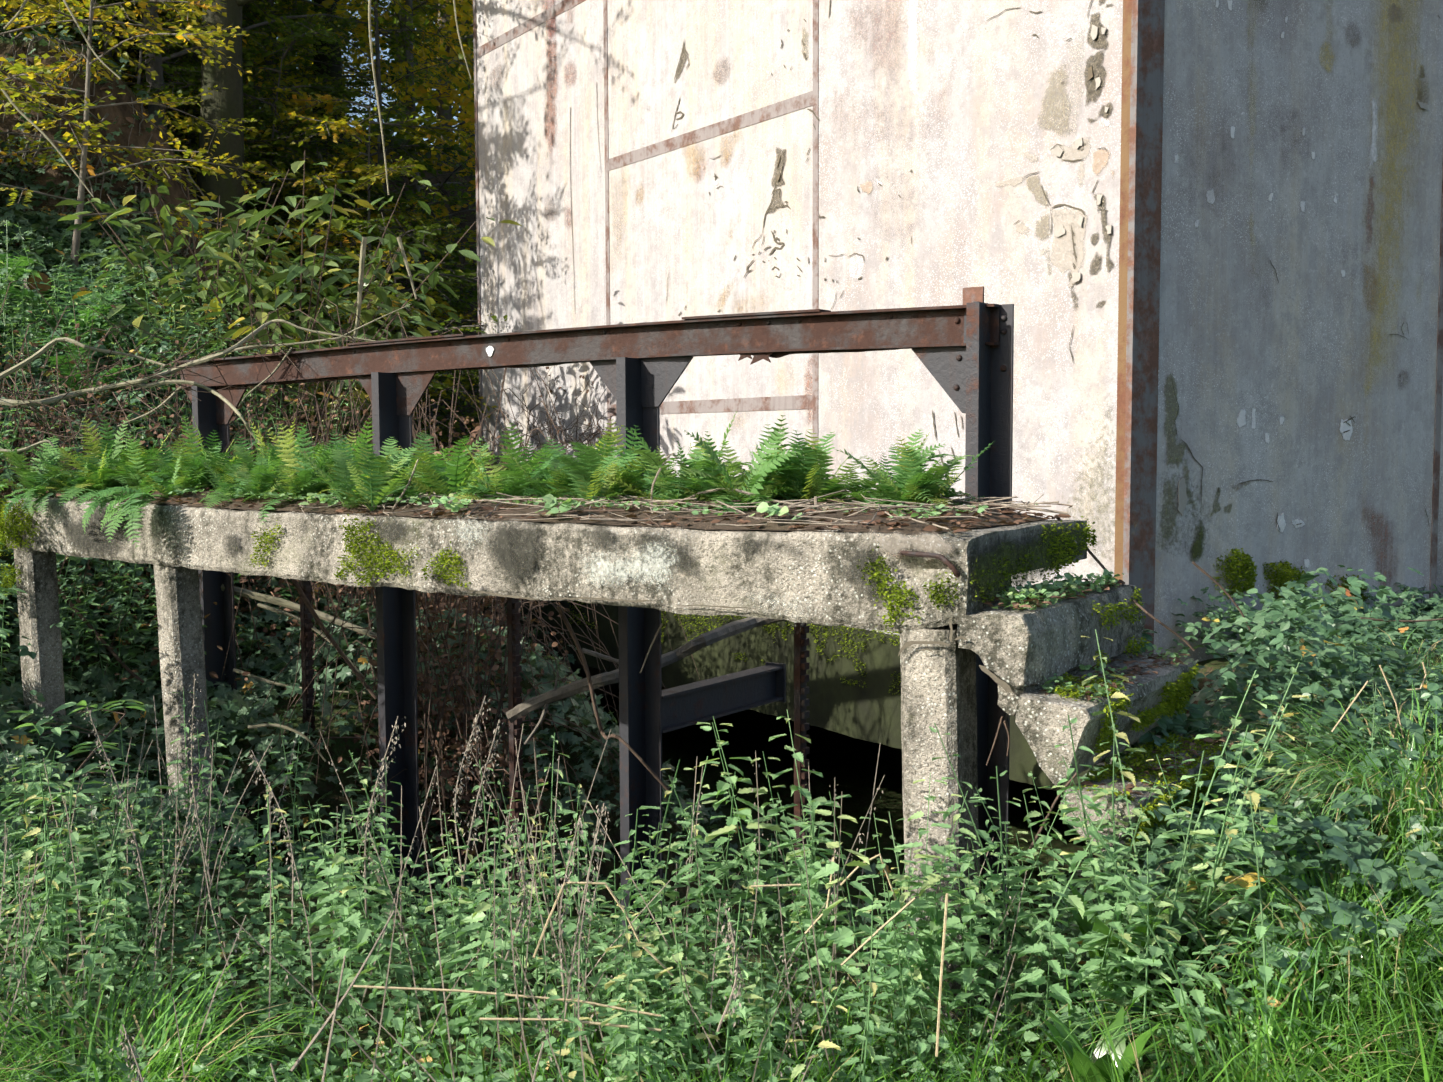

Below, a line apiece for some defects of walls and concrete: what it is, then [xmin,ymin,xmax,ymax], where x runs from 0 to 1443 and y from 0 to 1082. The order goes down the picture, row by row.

rust [545,0,557,146]
spalling [1066,0,1113,126]
spalling [734,148,865,283]
spalling [995,70,1113,308]
rust [738,352,774,365]